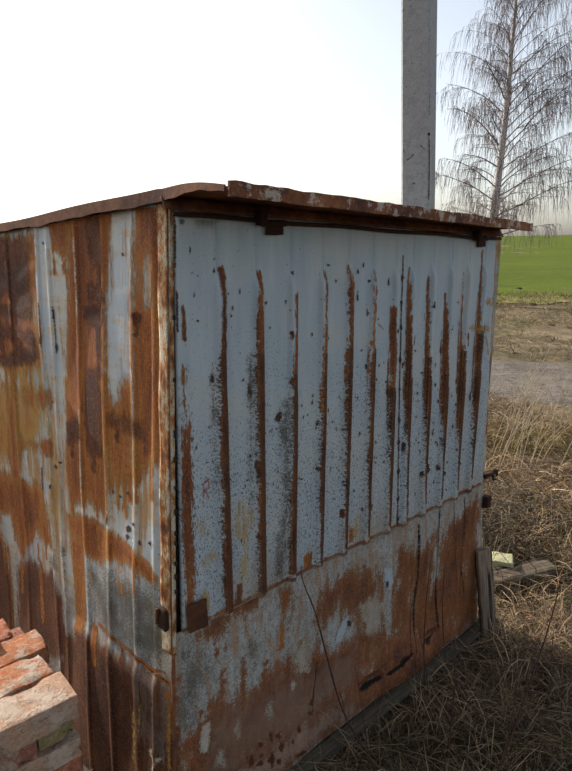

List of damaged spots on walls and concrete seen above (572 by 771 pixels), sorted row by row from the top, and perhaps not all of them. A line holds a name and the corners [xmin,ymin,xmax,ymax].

corrosion [0,207,493,771]